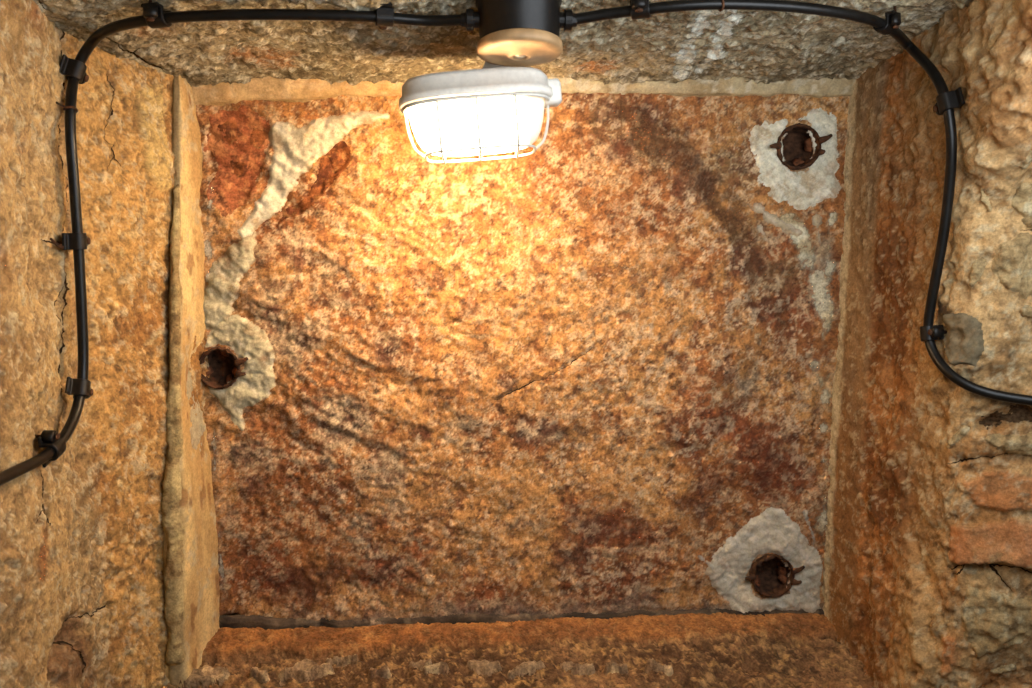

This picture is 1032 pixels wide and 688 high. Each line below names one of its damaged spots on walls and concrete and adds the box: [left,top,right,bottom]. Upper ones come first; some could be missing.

efflorescence [670,10,743,80]
water stain [203,231,257,331]
crack [949,564,1032,592]